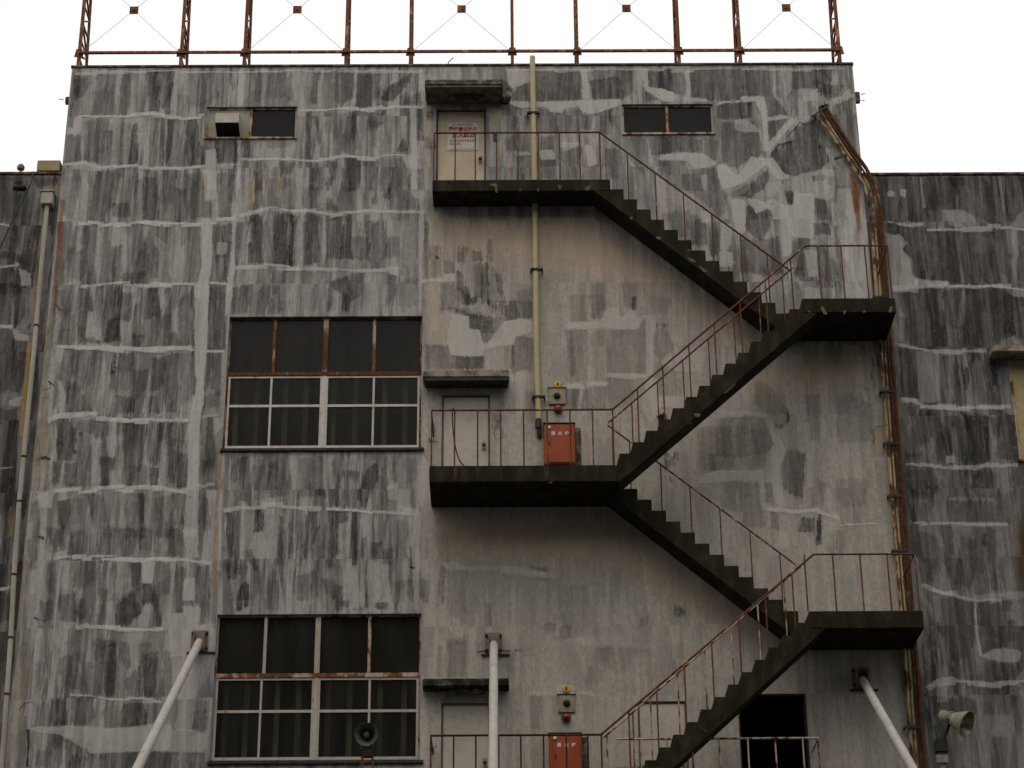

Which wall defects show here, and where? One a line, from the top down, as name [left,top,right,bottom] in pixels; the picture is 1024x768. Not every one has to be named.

corrosion [850,173,860,226]
damp [328,465,374,565]
damp [236,583,249,611]